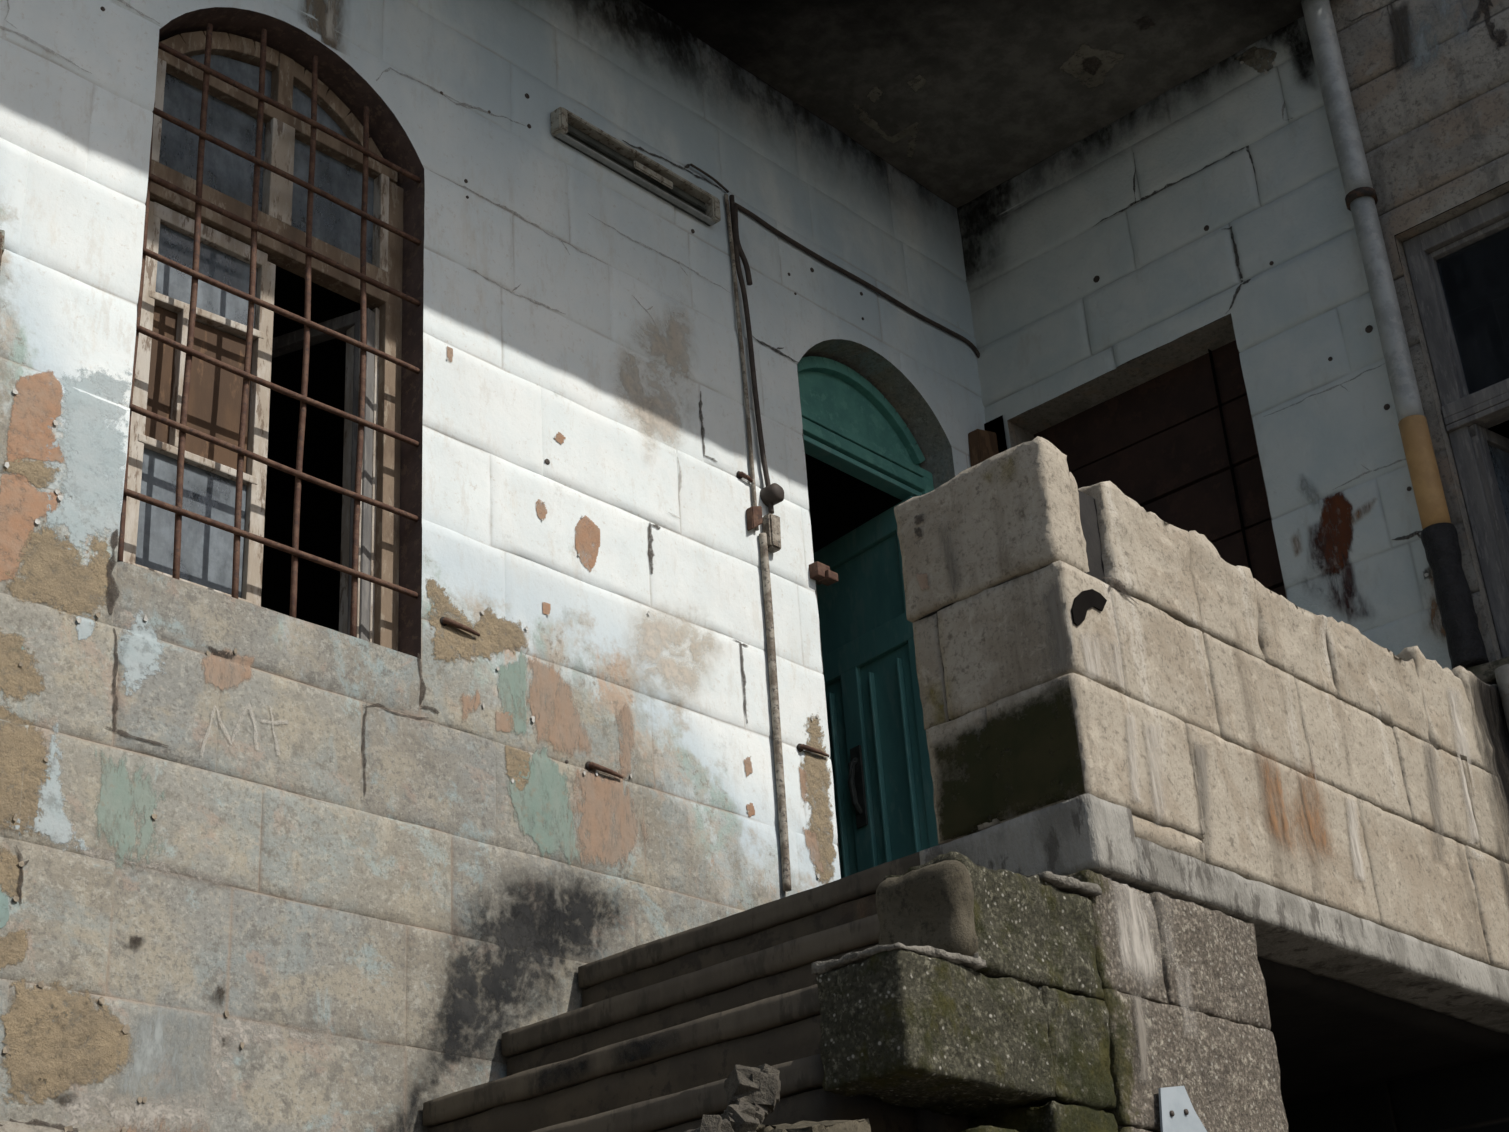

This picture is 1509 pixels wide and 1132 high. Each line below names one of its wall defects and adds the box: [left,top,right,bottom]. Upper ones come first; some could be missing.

water stain [304,0,343,50]
peeling [0,368,132,640]
peeling [575,515,600,572]
rust [1293,479,1370,618]
flaking render [637,611,713,689]
peeling [744,756,753,777]
peeling [799,714,837,884]
spalling [0,930,196,1108]
water stain [390,881,620,1132]